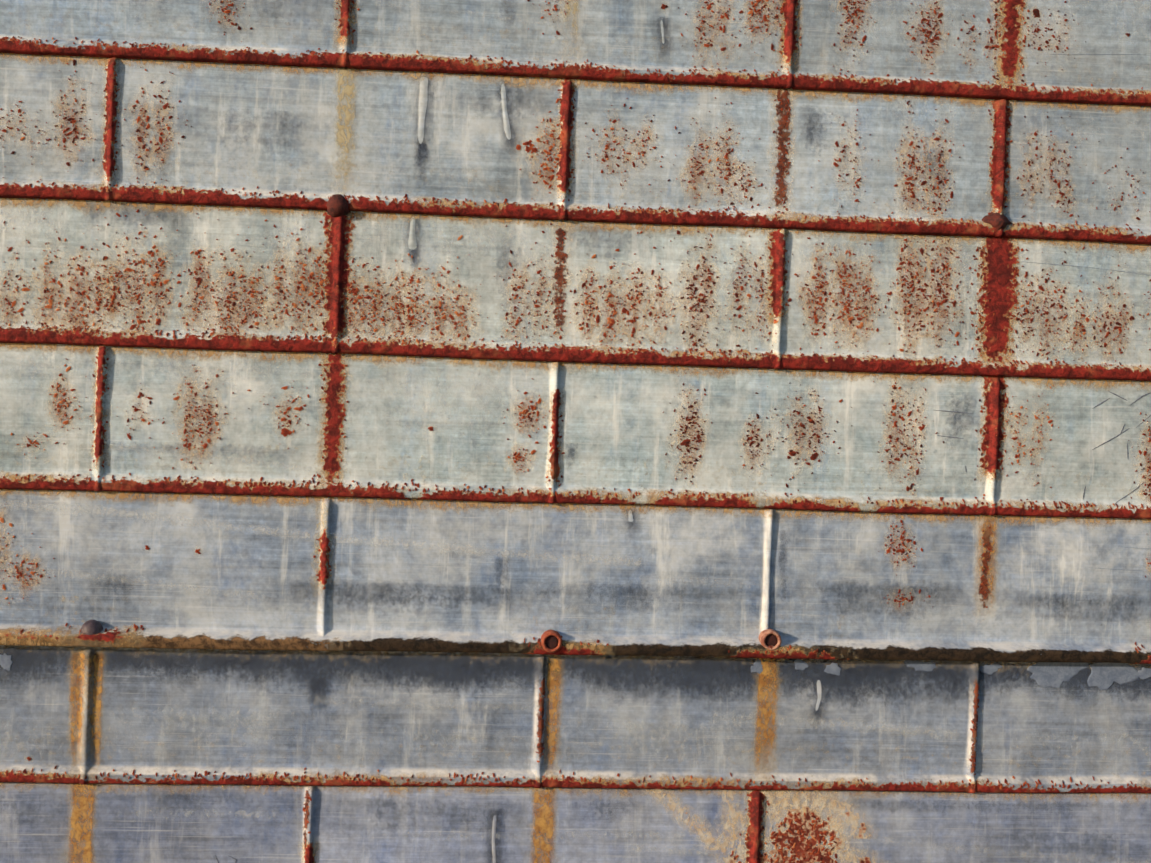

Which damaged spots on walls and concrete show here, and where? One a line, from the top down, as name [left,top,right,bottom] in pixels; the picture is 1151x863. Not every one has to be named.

rust [0,623,1151,863]